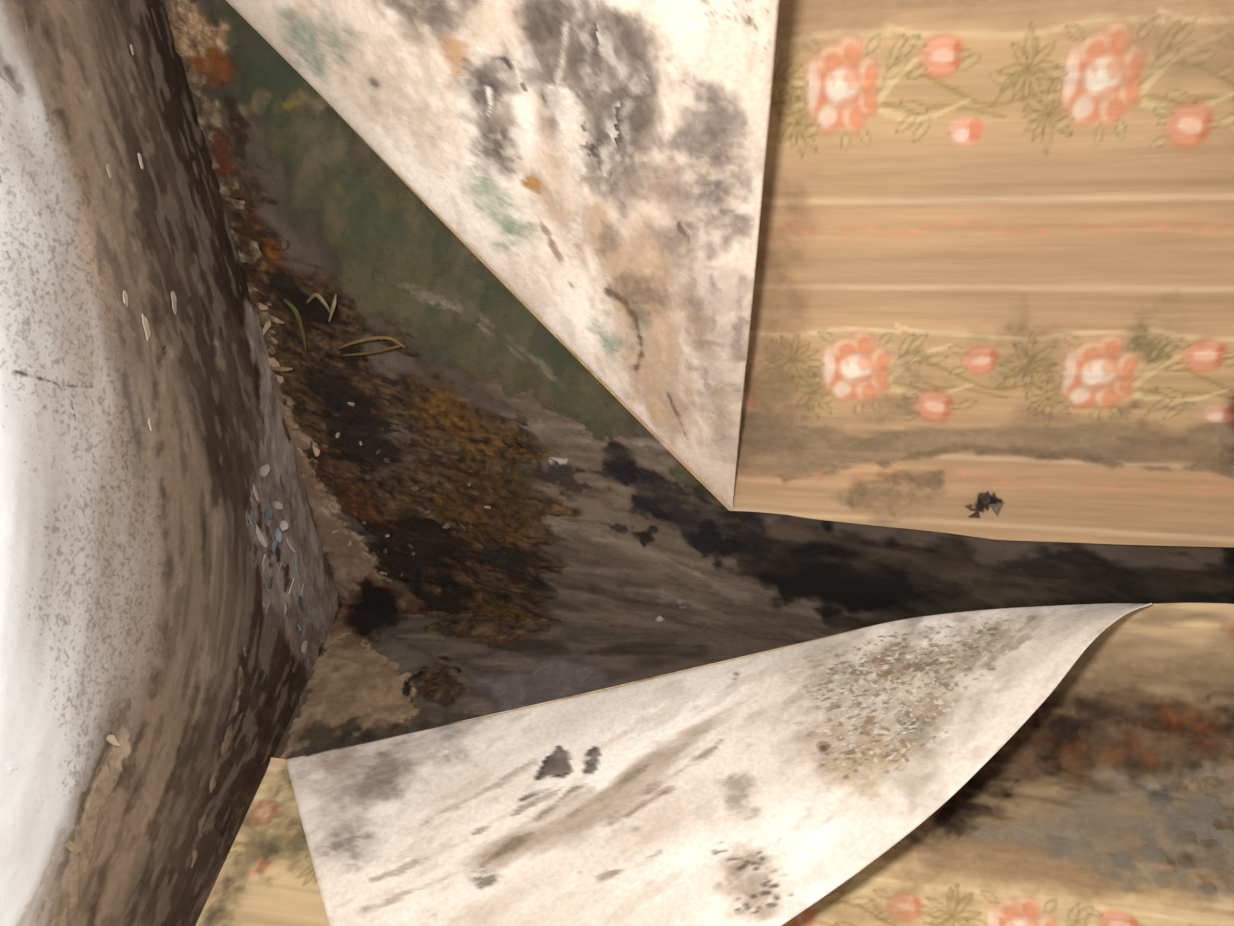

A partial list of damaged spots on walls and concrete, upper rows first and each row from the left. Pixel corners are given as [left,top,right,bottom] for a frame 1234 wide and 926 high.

water stain [393,0,749,434]
peeling [142,314,151,341]
water stain [0,0,402,926]
flaking render [167,0,867,759]
water stain [705,382,1234,475]
water stain [534,441,1234,785]
water stain [300,714,468,796]
water stain [371,860,416,881]
water stain [475,724,709,888]
water stain [715,851,778,917]
water stain [916,639,1234,894]